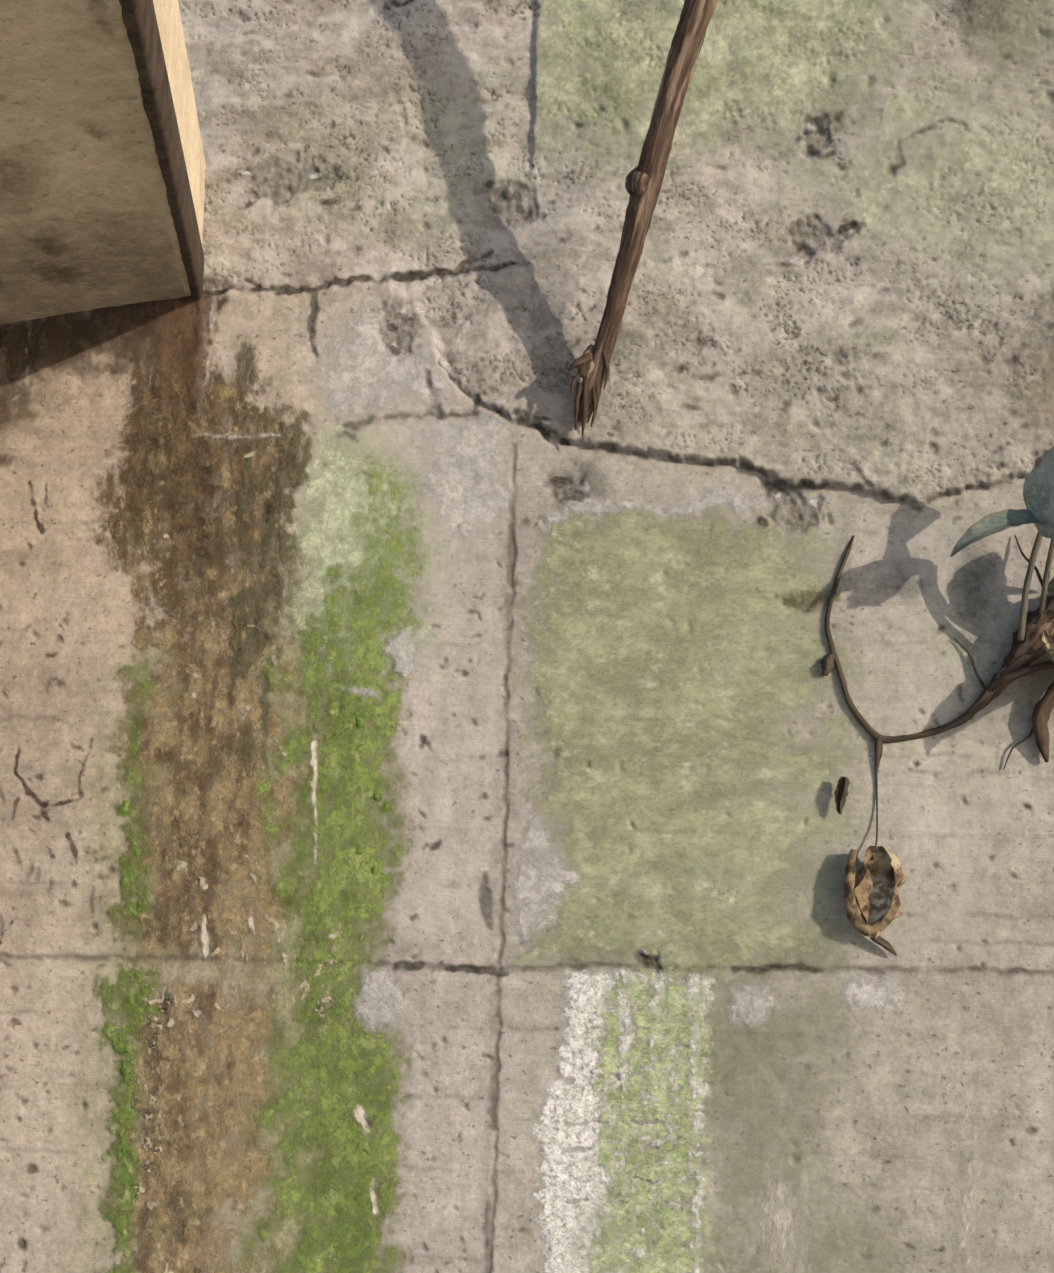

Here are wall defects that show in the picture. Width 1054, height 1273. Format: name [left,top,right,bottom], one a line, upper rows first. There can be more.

crack [202,251,516,353]
crack [339,372,825,511]
crack [855,467,953,511]
water stain [775,590,840,613]
water stain [0,222,326,1273]
water stain [297,933,339,1017]
efflorescence [530,970,715,1273]